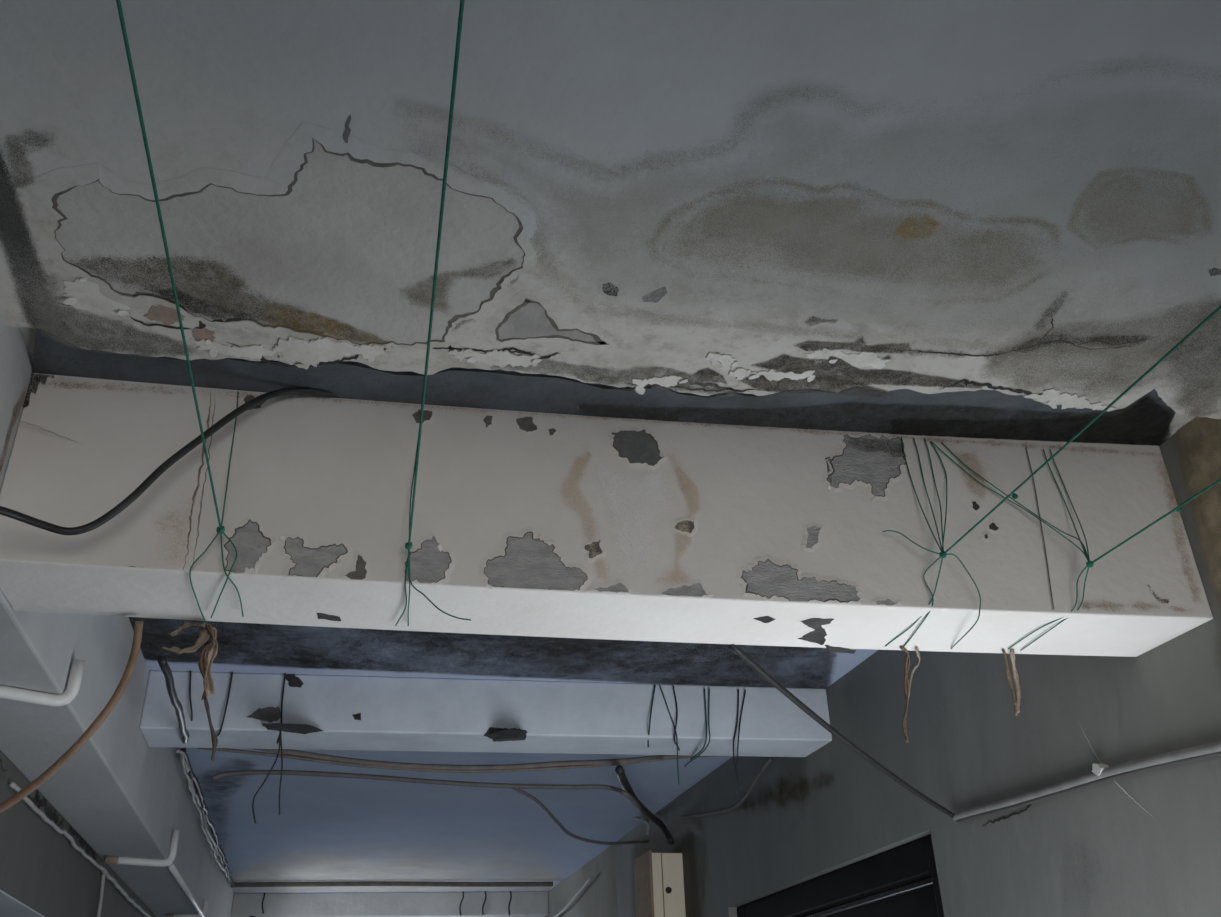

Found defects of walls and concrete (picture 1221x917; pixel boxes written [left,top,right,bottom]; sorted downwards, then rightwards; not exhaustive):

water stain [0,128,200,358]
water stain [67,253,307,328]
water stain [400,257,519,313]
peeling [27,122,1176,503]
water stain [491,291,1221,458]
peeling [217,515,371,580]
peeling [397,532,457,584]
peeling [478,527,633,594]
spalling [801,522,825,553]
peeling [736,554,905,654]